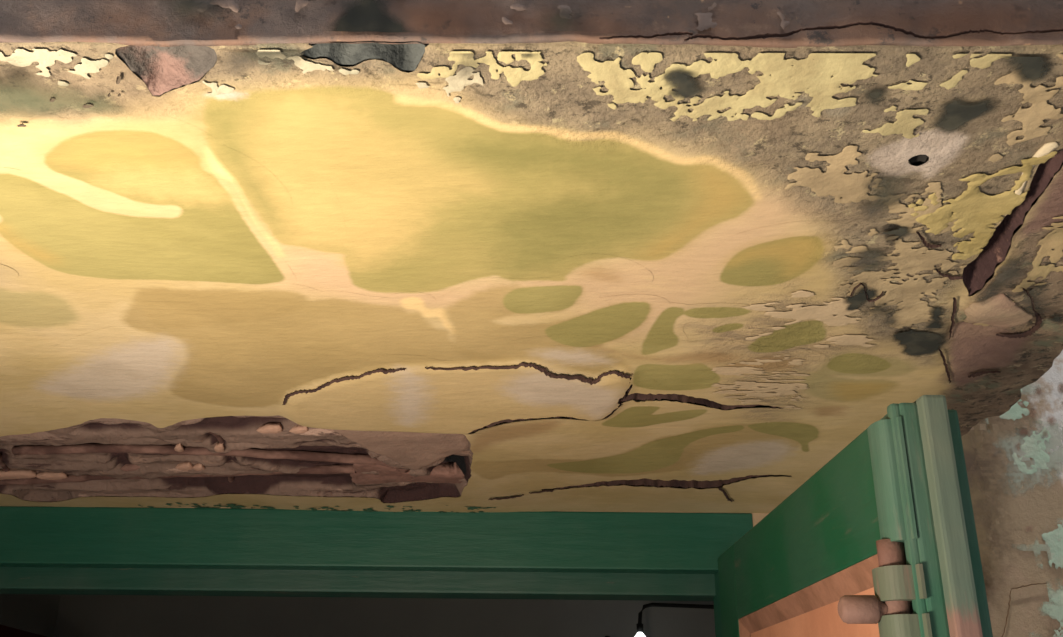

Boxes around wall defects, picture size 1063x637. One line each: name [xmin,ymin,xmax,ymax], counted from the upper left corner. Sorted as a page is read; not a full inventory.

crack [599,21,1063,41]
spalling [0,45,234,97]
spalling [257,42,547,104]
peeling [577,52,878,122]
peeling [888,54,1012,91]
leakage [846,100,993,216]
peeling [742,69,1063,392]
leakage [0,50,946,482]
crack [282,363,784,418]
crack [470,416,573,433]
spalling [0,415,496,513]
crack [488,475,791,502]